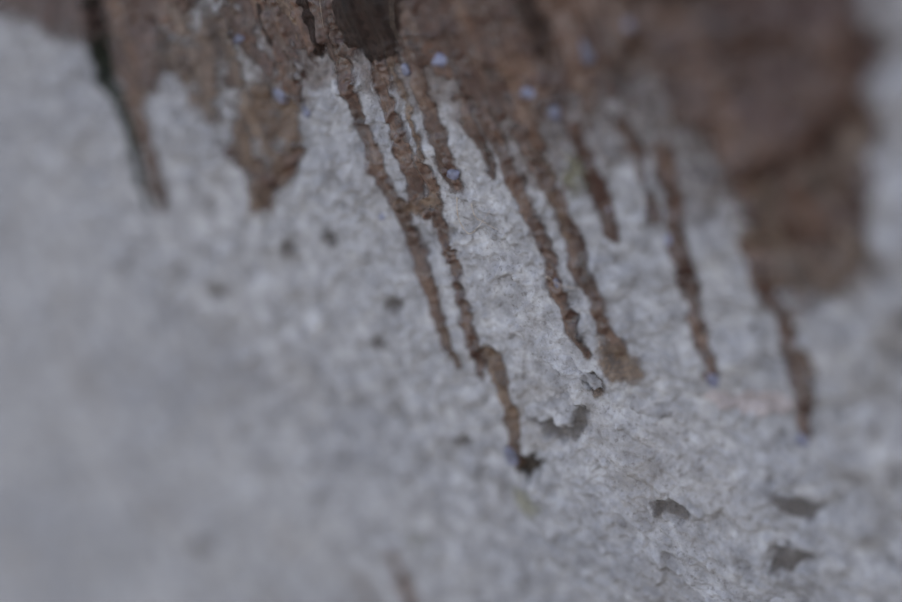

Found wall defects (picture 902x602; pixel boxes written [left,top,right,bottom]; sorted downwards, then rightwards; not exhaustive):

corrosion [592,341,644,398]